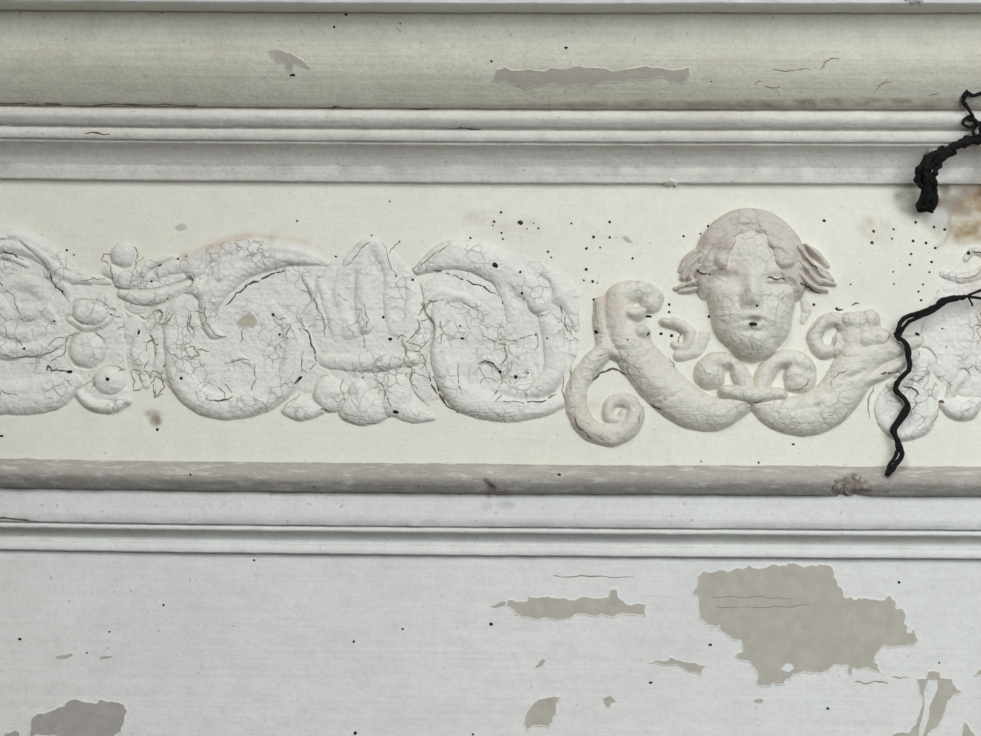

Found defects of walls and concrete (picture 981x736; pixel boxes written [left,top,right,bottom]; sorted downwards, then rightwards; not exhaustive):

peeling [491,65,691,90]
crack [346,242,499,296]
crack [0,283,95,387]
crack [50,247,369,410]
crack [397,299,661,439]
crack [320,379,391,425]
peeling [491,587,647,622]
peeling [691,561,919,703]
peeling [5,698,129,736]
peeling [523,695,561,732]
peeling [891,670,963,736]